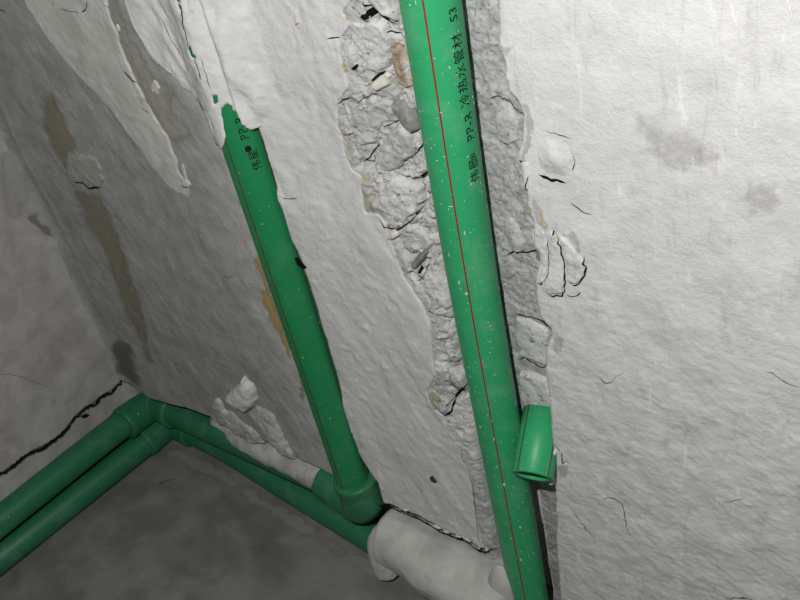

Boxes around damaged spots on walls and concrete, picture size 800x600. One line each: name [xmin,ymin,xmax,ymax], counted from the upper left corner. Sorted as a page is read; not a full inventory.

leakage [44,96,75,166]
peeling [24,0,189,197]
spalling [462,0,587,423]
leakage [76,191,151,362]
spalling [337,0,503,561]
leakage [113,342,138,384]
crack [0,379,122,475]
crack [377,504,495,553]
spalling [529,479,561,600]